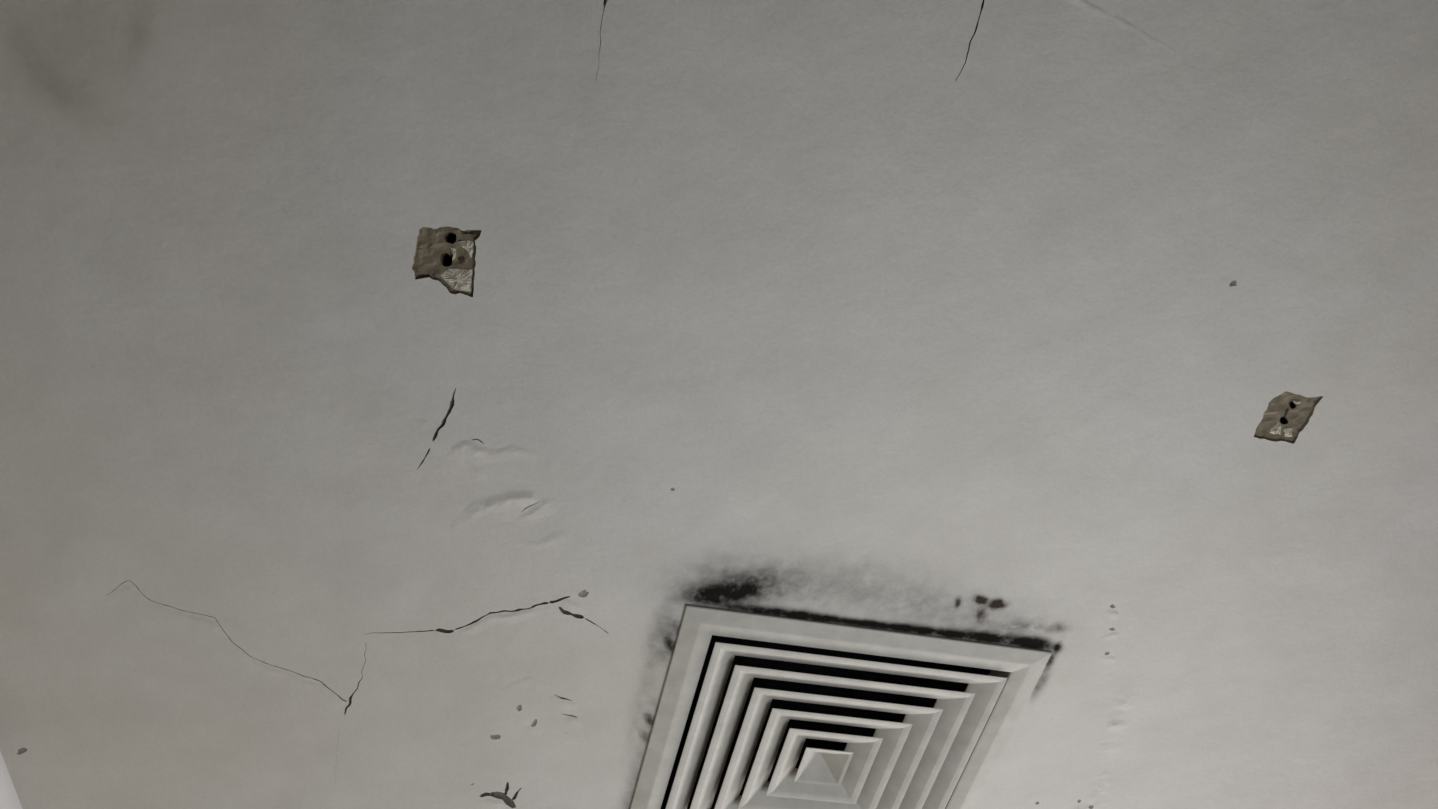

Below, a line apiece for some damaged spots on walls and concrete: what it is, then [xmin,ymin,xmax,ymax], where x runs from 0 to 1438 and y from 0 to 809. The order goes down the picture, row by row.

crack [596,0,608,79]
crack [955,0,984,81]
crack [403,388,456,468]
crack [368,590,609,637]
leakage [690,577,1061,666]